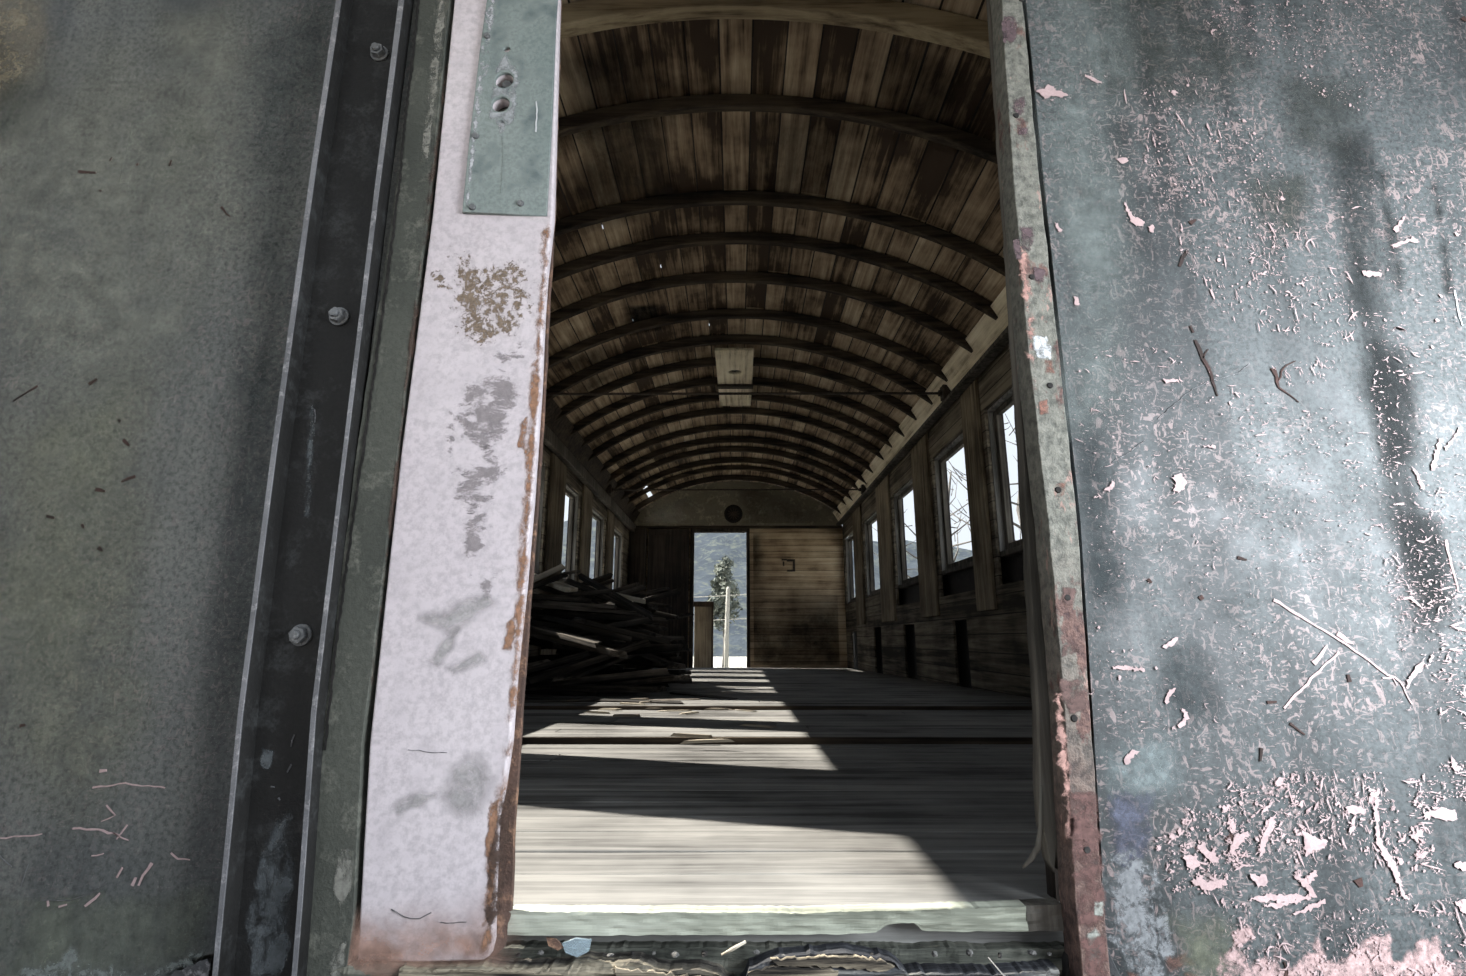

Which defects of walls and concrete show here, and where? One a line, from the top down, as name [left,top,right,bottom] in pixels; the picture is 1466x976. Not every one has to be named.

leakage [1339,140,1371,317]
rust [419,228,550,708]
peeling [1032,74,1466,765]
leakage [1369,343,1411,463]
leakage [1394,492,1443,608]
peeling [19,949,126,976]
rust [1056,679,1195,976]
peeling [1155,755,1466,976]